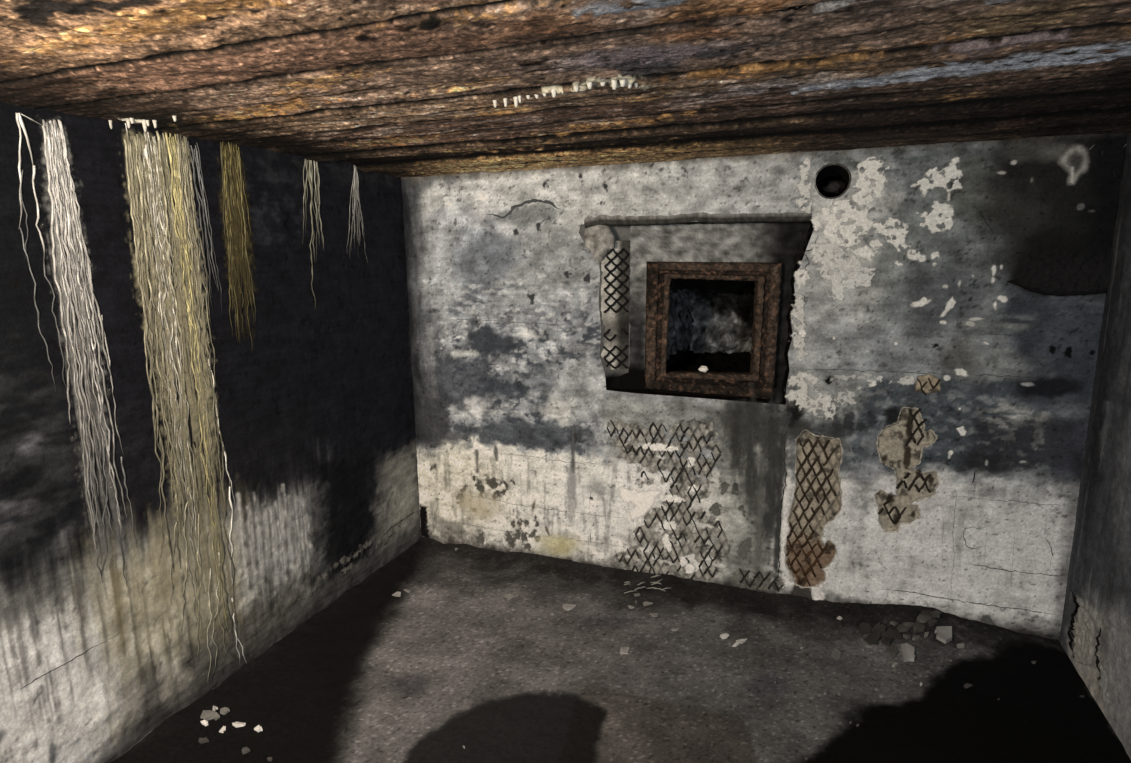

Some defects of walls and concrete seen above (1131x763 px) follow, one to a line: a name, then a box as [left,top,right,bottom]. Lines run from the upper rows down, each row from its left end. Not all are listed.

water stain [16,113,136,586]
water stain [110,123,422,763]
spalling [606,419,844,600]
peeling [785,157,967,420]
spalling [874,407,939,533]
peeling [940,275,974,324]